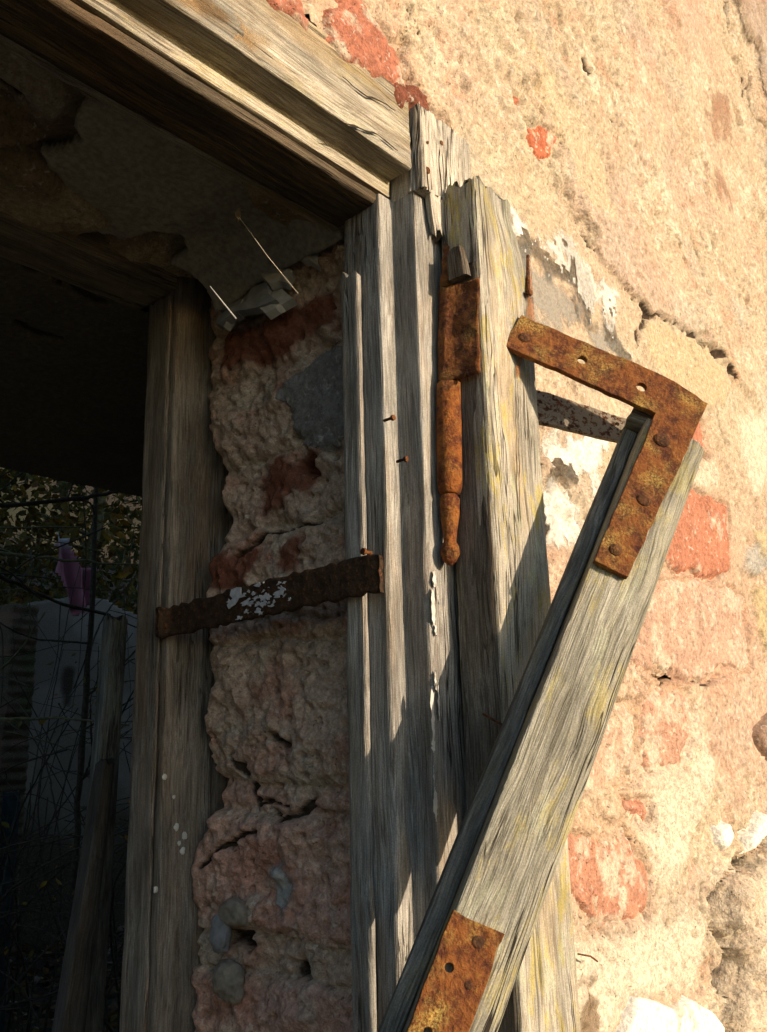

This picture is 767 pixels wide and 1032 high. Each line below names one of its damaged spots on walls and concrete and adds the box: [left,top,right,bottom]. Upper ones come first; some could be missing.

spalling [266,0,436,119]
flaking render [40,97,343,367]
rust [526,261,535,321]
crack [577,211,738,379]
spalling [263,450,322,513]
spalling [692,423,704,447]
spalling [209,538,302,620]
spalling [584,489,748,792]
spalling [567,799,648,930]